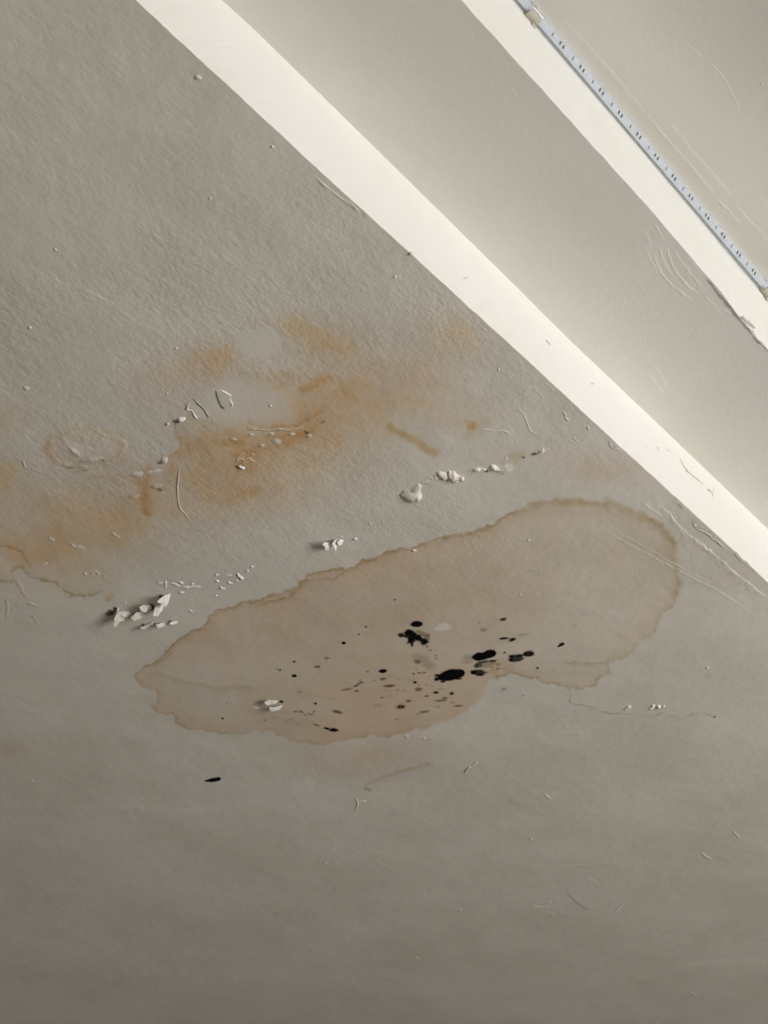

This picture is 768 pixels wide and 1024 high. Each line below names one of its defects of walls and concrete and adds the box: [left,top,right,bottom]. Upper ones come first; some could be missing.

peeling [322,521,390,551]
peeling [106,594,178,630]
mould [398,621,428,647]
mould [434,637,539,695]